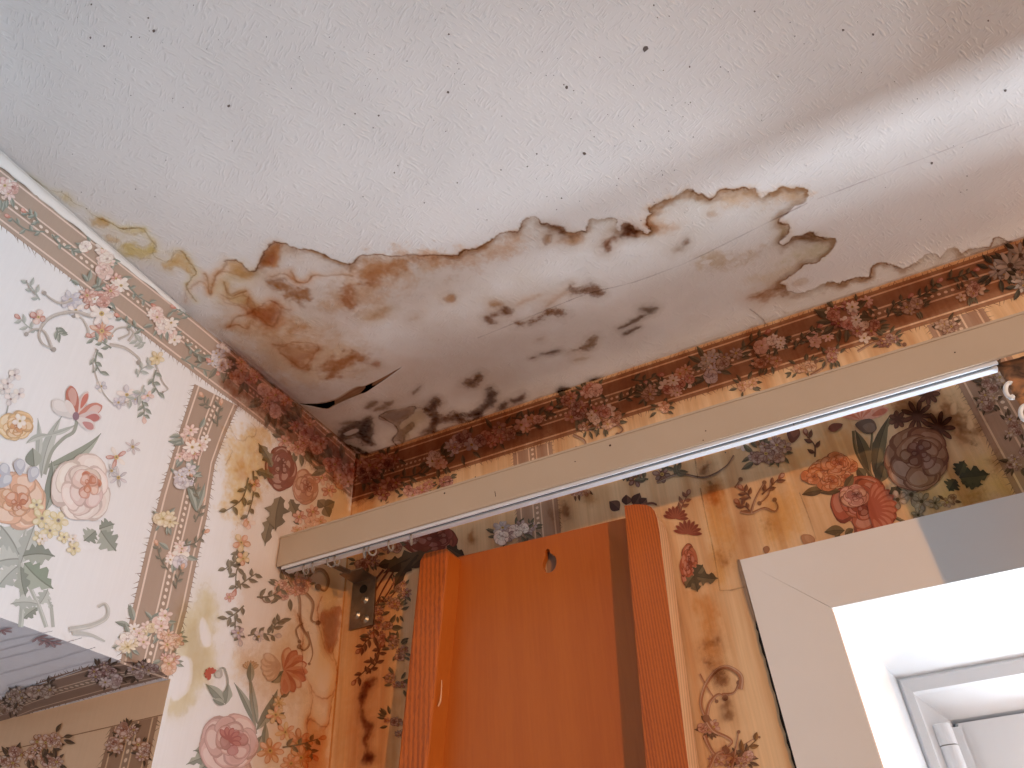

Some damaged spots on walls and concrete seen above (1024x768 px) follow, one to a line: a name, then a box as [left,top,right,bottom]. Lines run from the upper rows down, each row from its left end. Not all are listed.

damp [606,208,653,246]
damp [572,286,604,295]
damp [620,308,656,335]
mould [411,375,524,433]
mould [339,402,405,456]